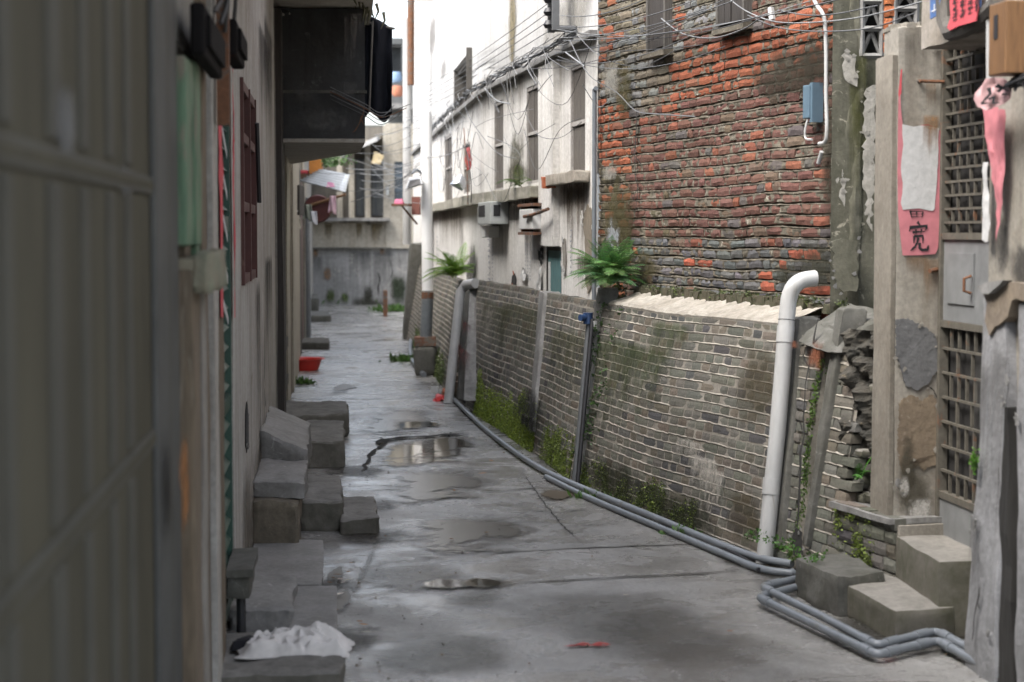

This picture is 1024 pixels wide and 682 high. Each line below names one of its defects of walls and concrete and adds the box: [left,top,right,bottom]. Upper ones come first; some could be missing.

peeling [829,48,876,295]
water stain [515,390,541,432]
spalling [838,328,874,504]
spalling [893,318,938,473]